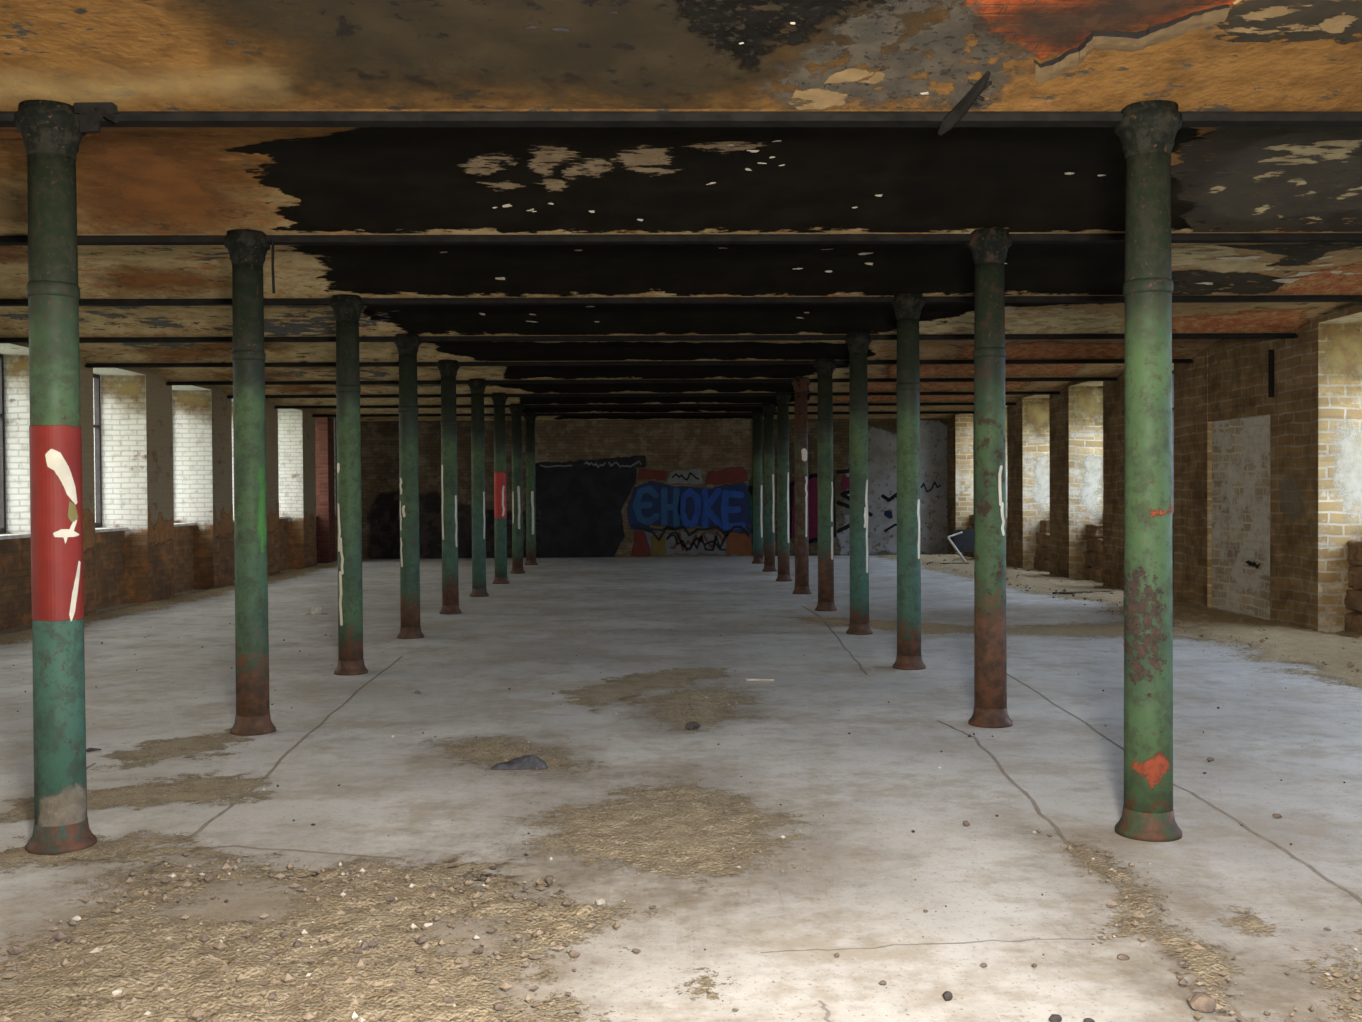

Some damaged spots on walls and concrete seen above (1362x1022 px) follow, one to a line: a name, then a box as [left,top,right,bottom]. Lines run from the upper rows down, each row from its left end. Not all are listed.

peeling [788,68,885,110]
leakage [763,0,1035,109]
spalling [965,0,1362,84]
peeling [458,140,785,212]
peeling [1171,127,1362,333]
crack [181,656,403,859]
crack [1007,674,1124,750]
crack [938,721,1250,1022]
crack [1173,784,1362,904]